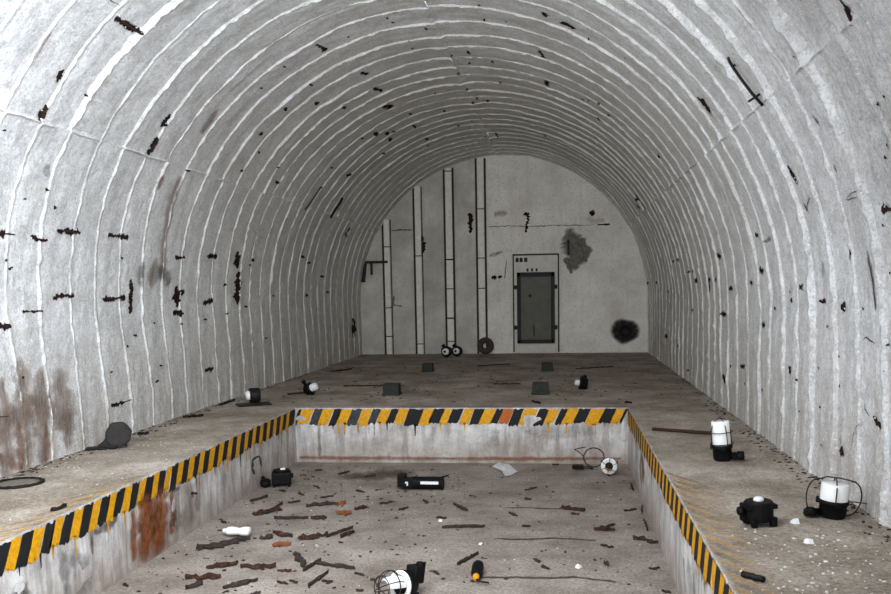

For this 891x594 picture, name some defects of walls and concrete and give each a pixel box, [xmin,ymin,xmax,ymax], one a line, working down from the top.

damp [561,229,592,274]
corrosion [131,491,176,559]